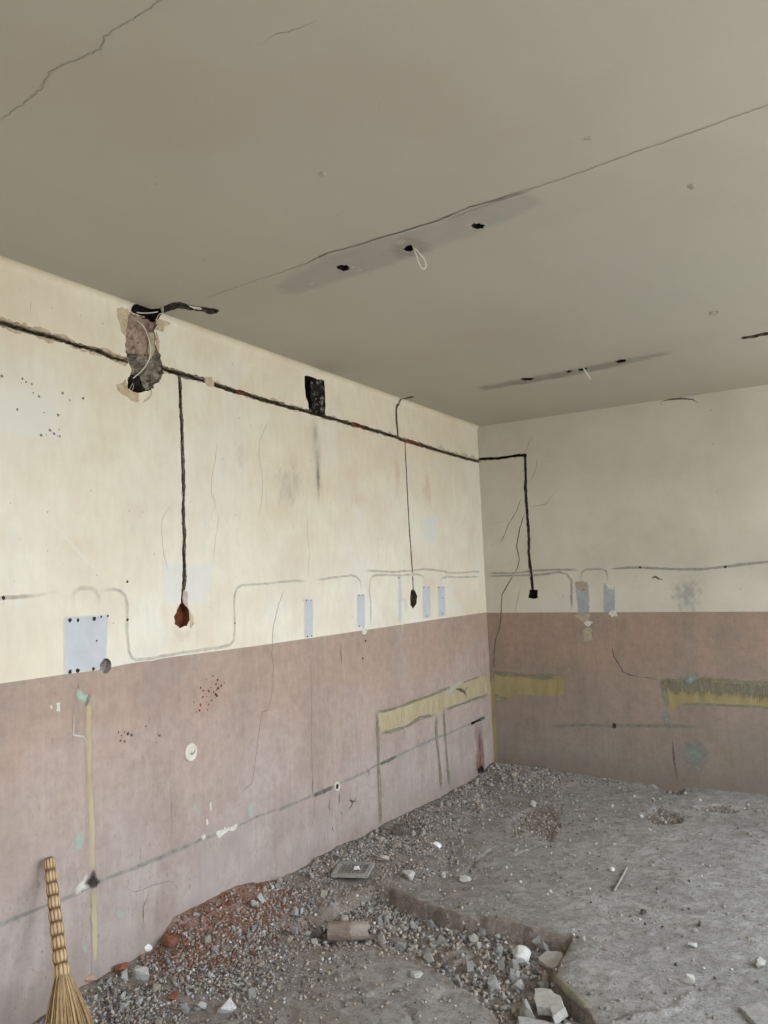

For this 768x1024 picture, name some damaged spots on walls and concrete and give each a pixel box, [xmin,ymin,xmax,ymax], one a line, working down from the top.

crack [0,0,162,120]
crack [206,104,768,298]
spalling [116,380,139,403]
spalling [117,302,219,361]
spalling [245,376,326,419]
crack [493,438,556,663]
crack [244,593,283,790]
peeling [202,802,238,840]